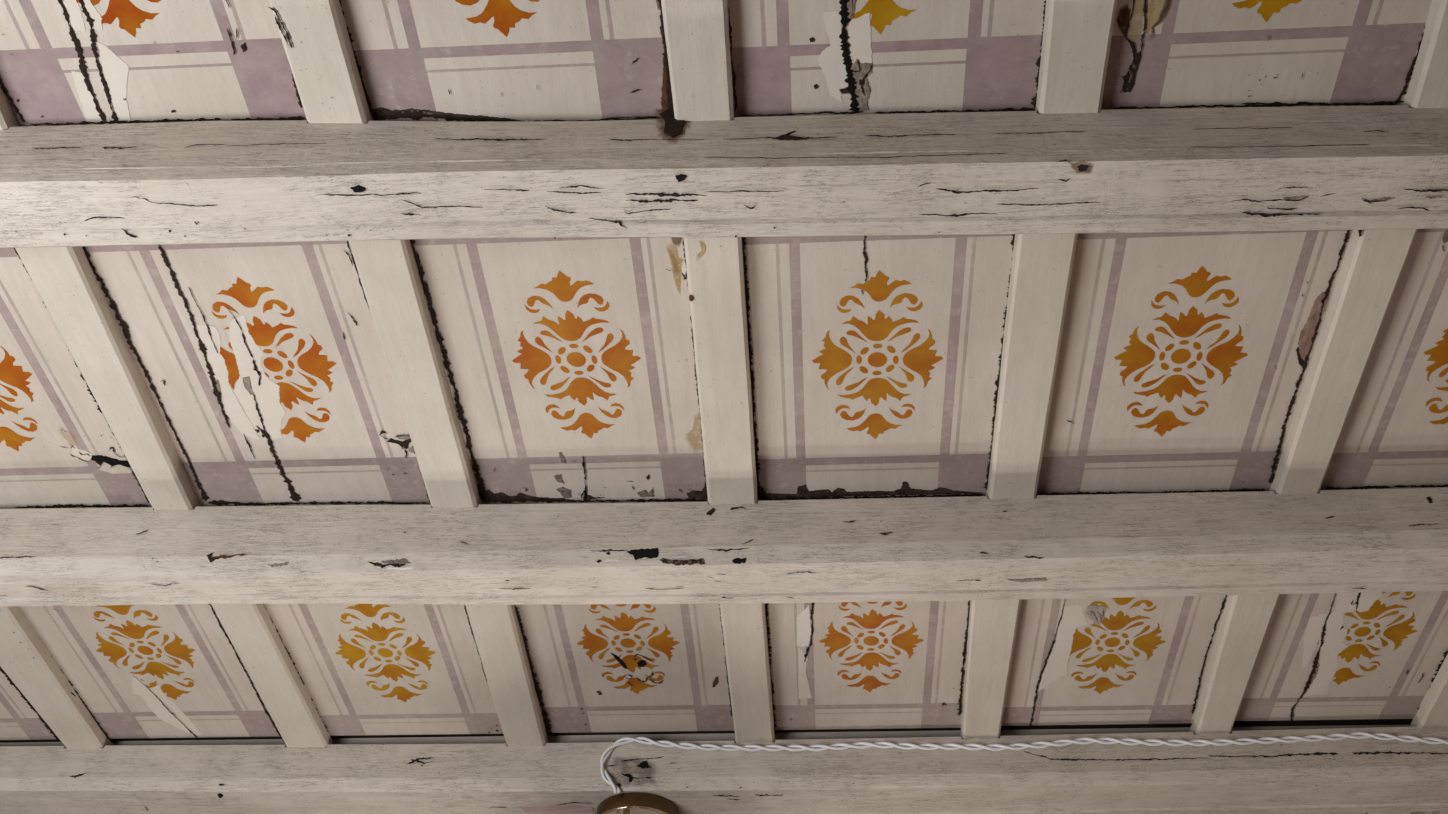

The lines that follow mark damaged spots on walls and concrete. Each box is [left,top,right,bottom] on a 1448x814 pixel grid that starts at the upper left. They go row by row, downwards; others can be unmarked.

crack [34,0,137,149]
crack [184,141,327,149]
crack [317,0,1100,229]
crack [1120,0,1147,93]
crack [85,196,301,502]
peeling [1038,645,1066,692]
crack [959,577,1448,761]